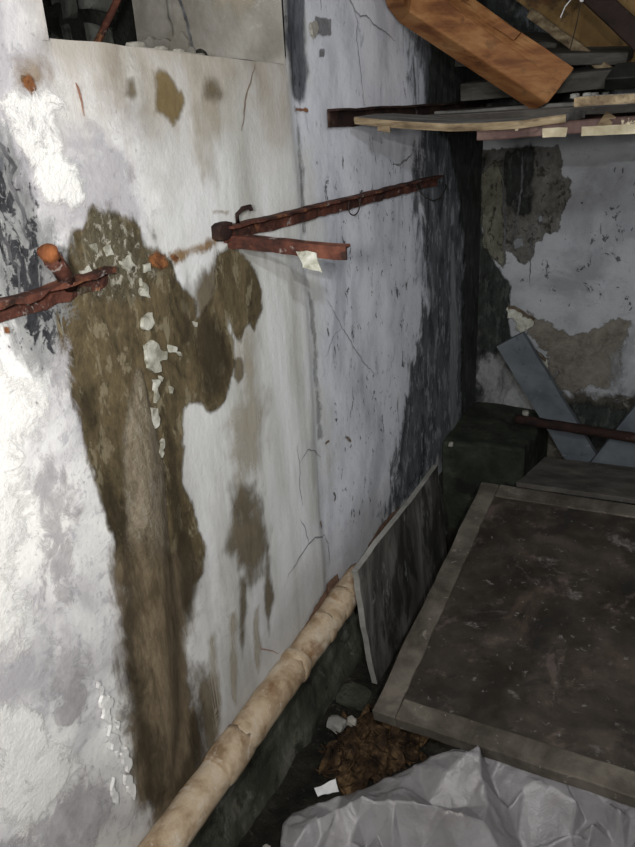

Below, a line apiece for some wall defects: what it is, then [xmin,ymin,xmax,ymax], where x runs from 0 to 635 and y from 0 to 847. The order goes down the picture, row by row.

damp [156,70,184,124]
crack [350,0,395,90]
damp [407,29,522,107]
flaking render [481,145,572,282]
rust [0,243,117,333]
peeling [89,243,151,298]
peeling [140,312,155,330]
damp [381,130,535,523]
peeling [506,304,535,333]
peeling [143,340,182,428]
damp [0,128,262,824]
damp [228,481,274,667]